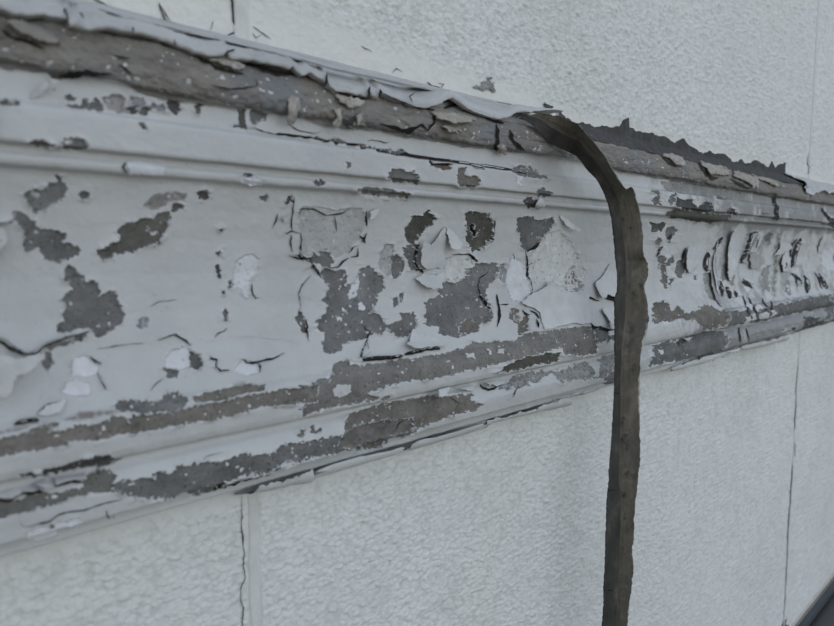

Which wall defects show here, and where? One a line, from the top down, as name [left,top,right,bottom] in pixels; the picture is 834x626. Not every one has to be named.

peeling [0,0,649,626]
peeling [649,222,677,246]
peeling [657,246,701,289]
spalling [577,118,808,213]
peeling [703,272,716,301]
peeling [648,293,834,367]
peeling [720,263,771,292]
spalling [805,191,834,205]
crack [783,372,798,622]
crack [239,499,247,626]